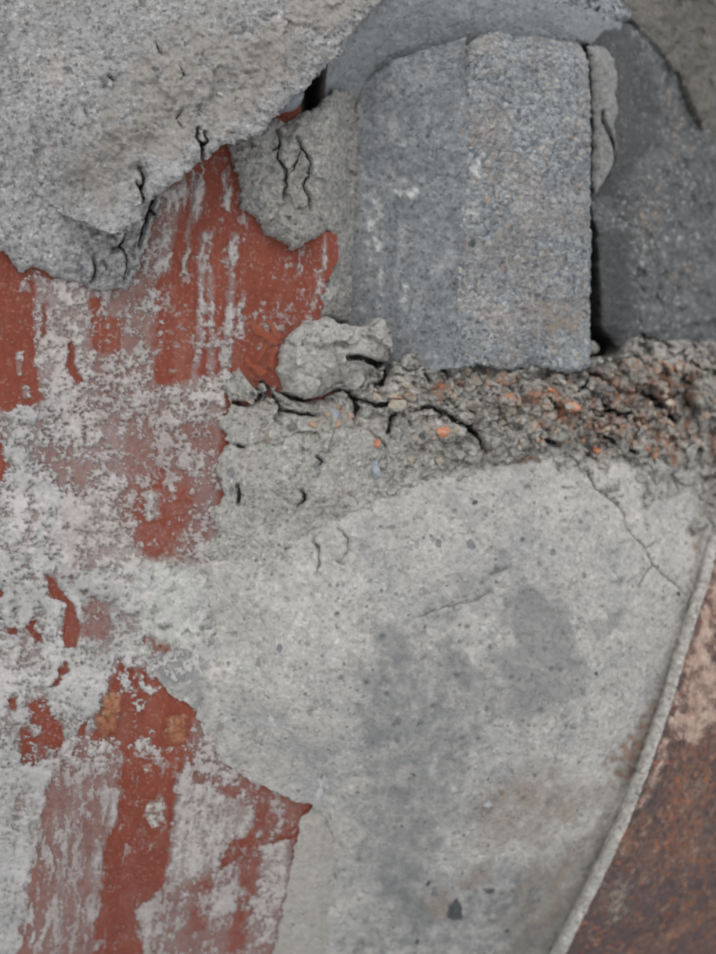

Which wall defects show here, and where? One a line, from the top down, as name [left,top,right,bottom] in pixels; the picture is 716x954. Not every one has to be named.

crack [176,110,209,157]
crack [272,132,312,209]
crack [599,111,616,191]
crack [92,169,155,281]
spalling [436,427,450,438]
peeling [0,386,219,954]
rust [613,723,651,779]
peeling [135,708,294,954]